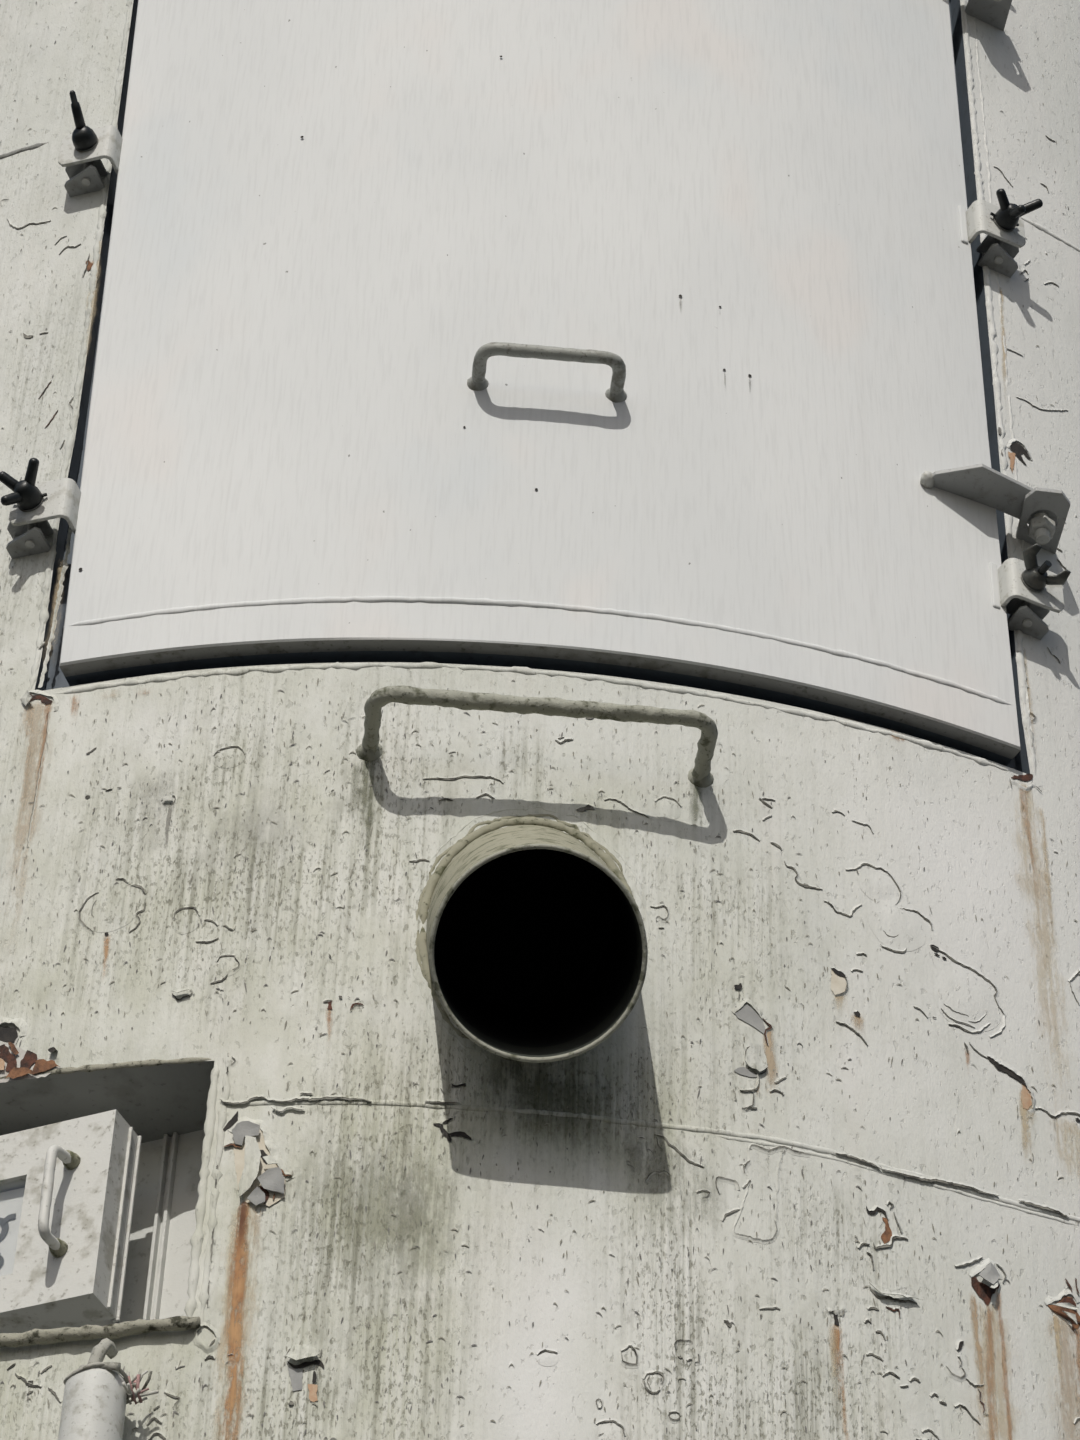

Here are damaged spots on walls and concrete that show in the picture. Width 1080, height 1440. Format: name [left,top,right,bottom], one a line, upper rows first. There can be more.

peeling [730,983,774,1112]
crack [220,1053,371,1112]
crack [425,1081,475,1142]
peeling [223,1111,295,1206]
crack [645,1132,751,1201]
crack [835,1151,1069,1217]
crack [207,1165,218,1308]
rust [225,1204,248,1438]
rust [972,1300,983,1374]
peeling [954,1255,1008,1305]
peeling [1044,1278,1080,1331]
peeling [283,1343,324,1405]